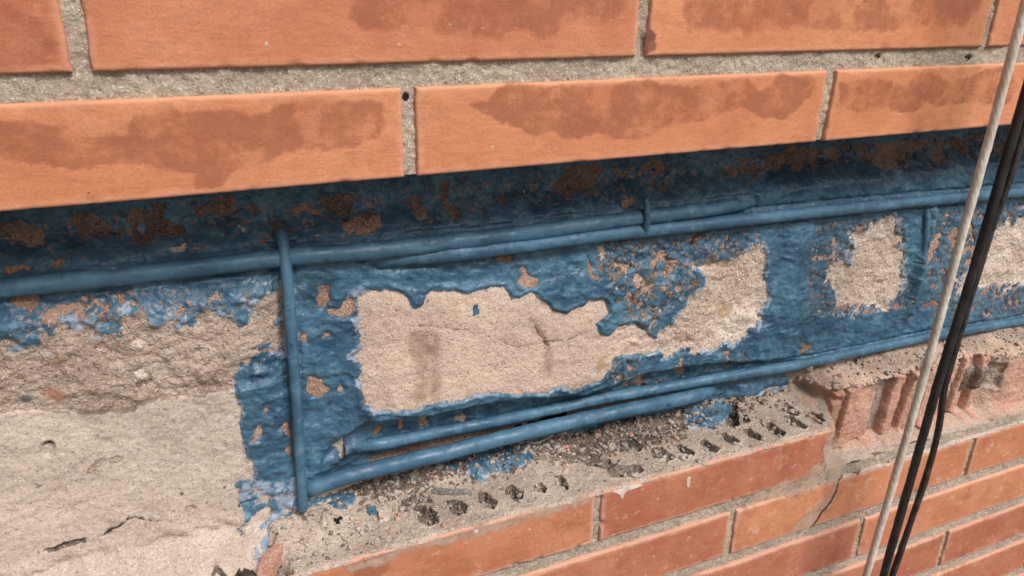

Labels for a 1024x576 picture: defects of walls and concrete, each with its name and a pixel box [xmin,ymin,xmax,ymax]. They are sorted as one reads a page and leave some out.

peeling [0,179,1024,496]
spalling [44,537,86,553]
crack [103,516,162,535]
crack [809,460,860,529]